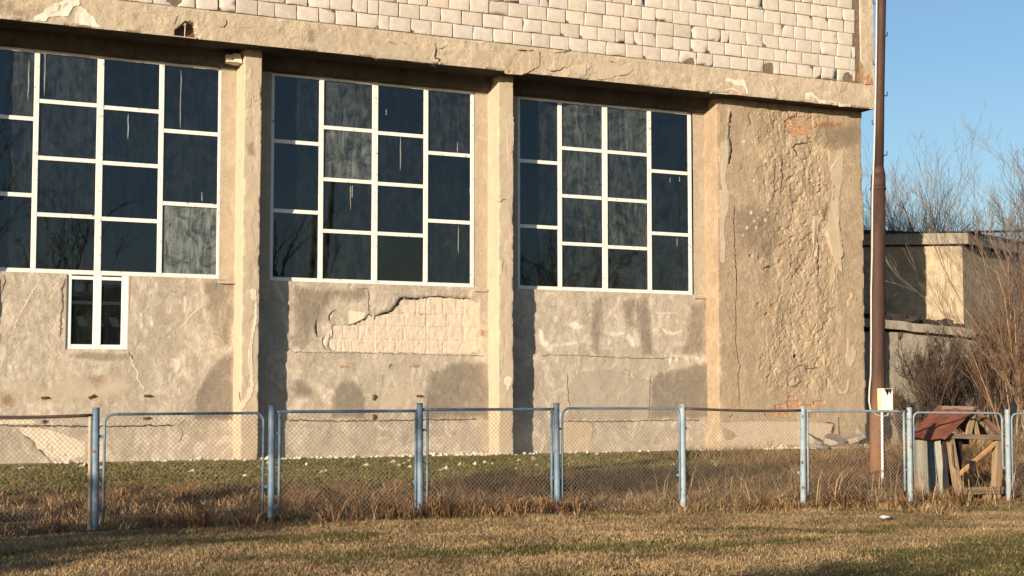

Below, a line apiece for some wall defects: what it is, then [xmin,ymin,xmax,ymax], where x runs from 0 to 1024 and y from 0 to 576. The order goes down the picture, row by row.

peeling [34,0,100,28]
spalling [174,23,196,42]
crack [726,112,751,170]
peeling [779,150,844,274]
crack [292,288,484,367]
spalling [323,297,483,353]
water stain [538,321,583,352]
water stain [604,331,635,349]
crack [730,205,741,417]
water stain [376,384,411,409]
water stain [569,357,705,418]
spalling [0,420,84,463]